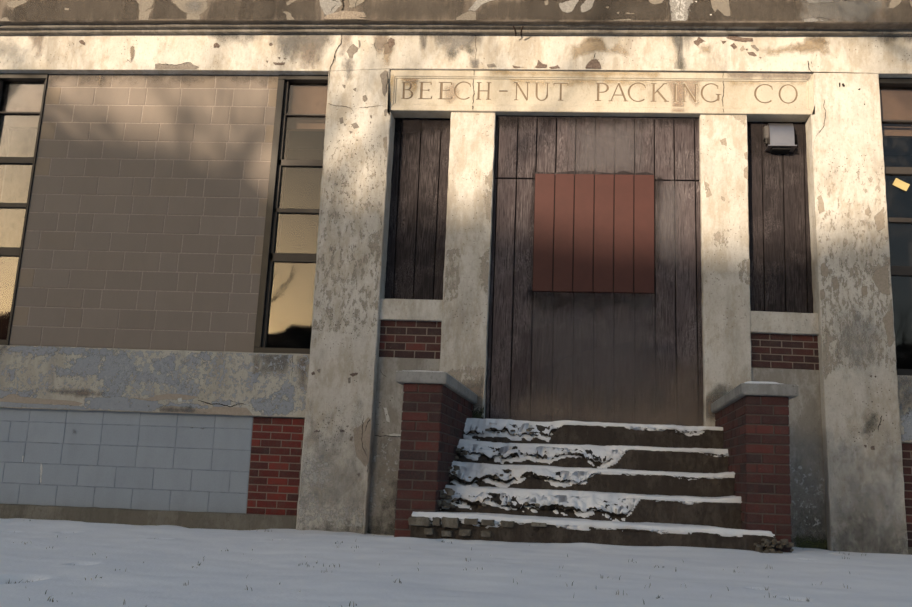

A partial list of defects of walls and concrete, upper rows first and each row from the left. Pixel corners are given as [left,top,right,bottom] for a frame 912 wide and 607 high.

peeling [136,0,154,20]
peeling [171,0,208,20]
spalling [319,0,369,20]
peeling [456,0,492,20]
peeling [559,0,595,13]
peeling [710,0,731,16]
peeling [649,0,709,52]
peeling [722,36,761,58]
peeling [312,115,387,349]
peeling [815,154,912,453]
peeling [0,346,320,416]
crack [198,399,249,407]